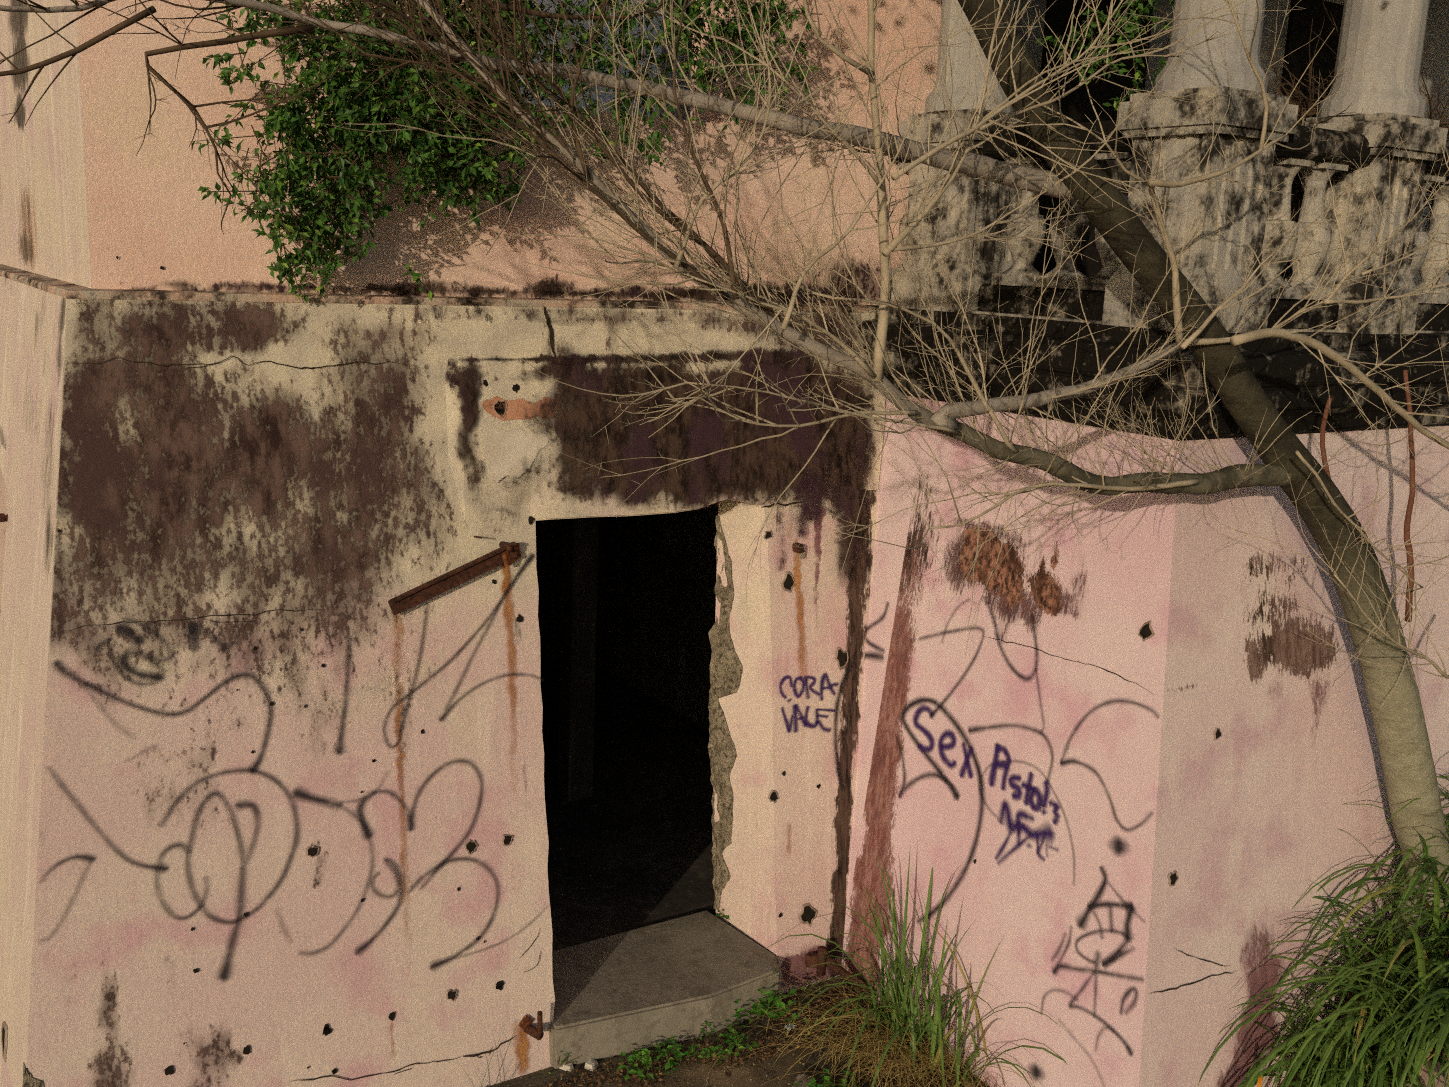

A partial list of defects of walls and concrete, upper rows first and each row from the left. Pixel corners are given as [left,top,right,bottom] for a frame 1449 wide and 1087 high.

peeling [482,380,557,483]
water stain [23,259,885,988]
corrosion [388,541,521,710]
corrosion [794,541,805,663]
spalling [956,526,1064,616]
spalling [1242,552,1339,684]
corrosion [395,704,404,822]
spalling [708,515,742,910]
spalling [22,1062,44,1087]
mould [87,975,132,1087]
mould [186,1025,243,1087]
crack [291,1036,516,1082]